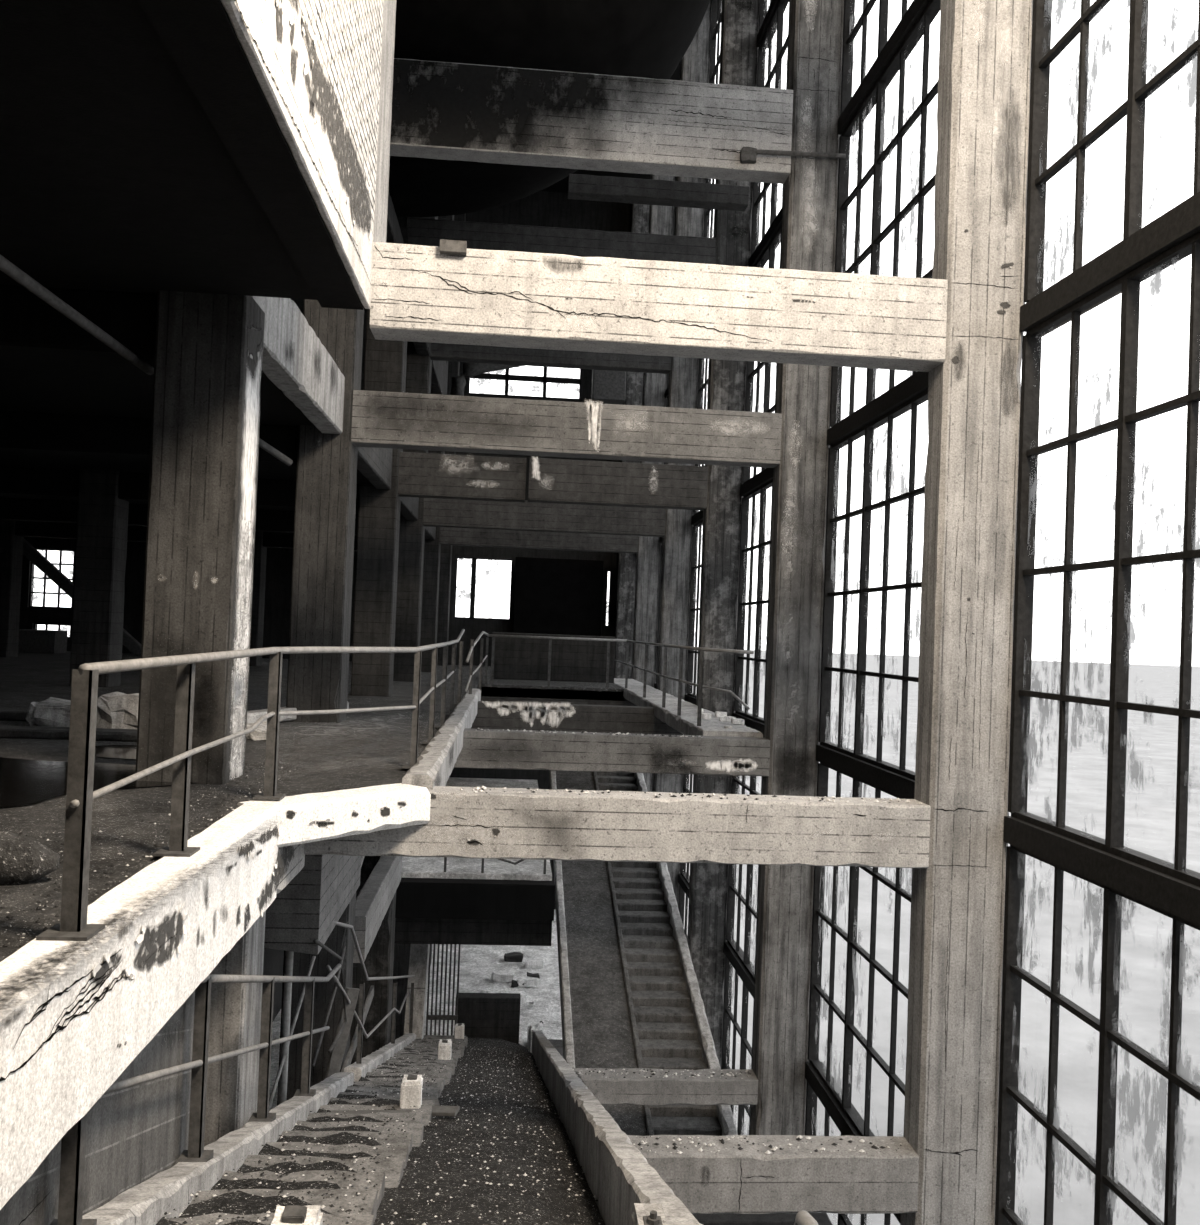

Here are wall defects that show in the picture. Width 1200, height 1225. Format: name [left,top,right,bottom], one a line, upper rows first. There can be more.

flaking render [275,0,372,238]
crack [234,0,769,341]
crack [0,949,134,1081]
peeling [92,902,188,985]